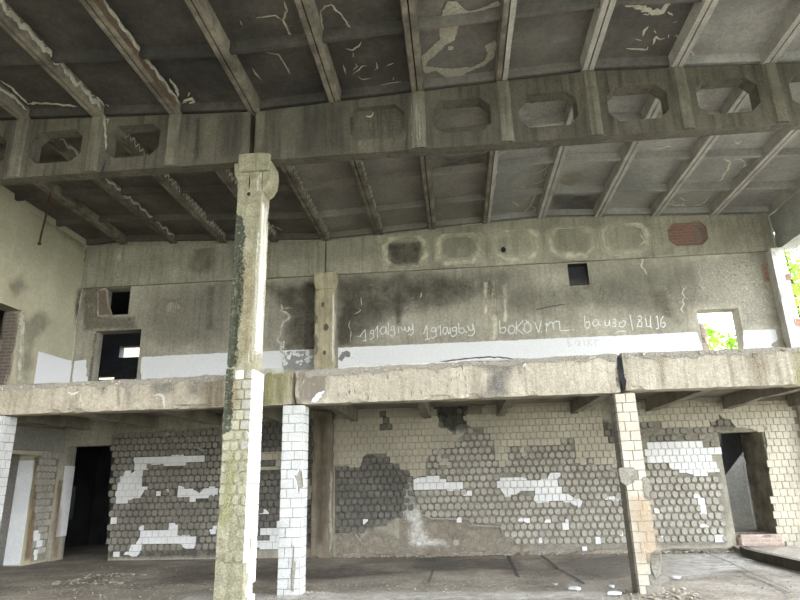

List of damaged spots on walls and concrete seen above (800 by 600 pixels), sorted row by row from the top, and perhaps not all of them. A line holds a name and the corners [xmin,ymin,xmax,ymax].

damp [222,203,281,434]
crack [276,304,295,400]
damp [278,282,315,350]
damp [337,232,507,343]
crack [617,355,626,390]
spalling [619,467,651,500]